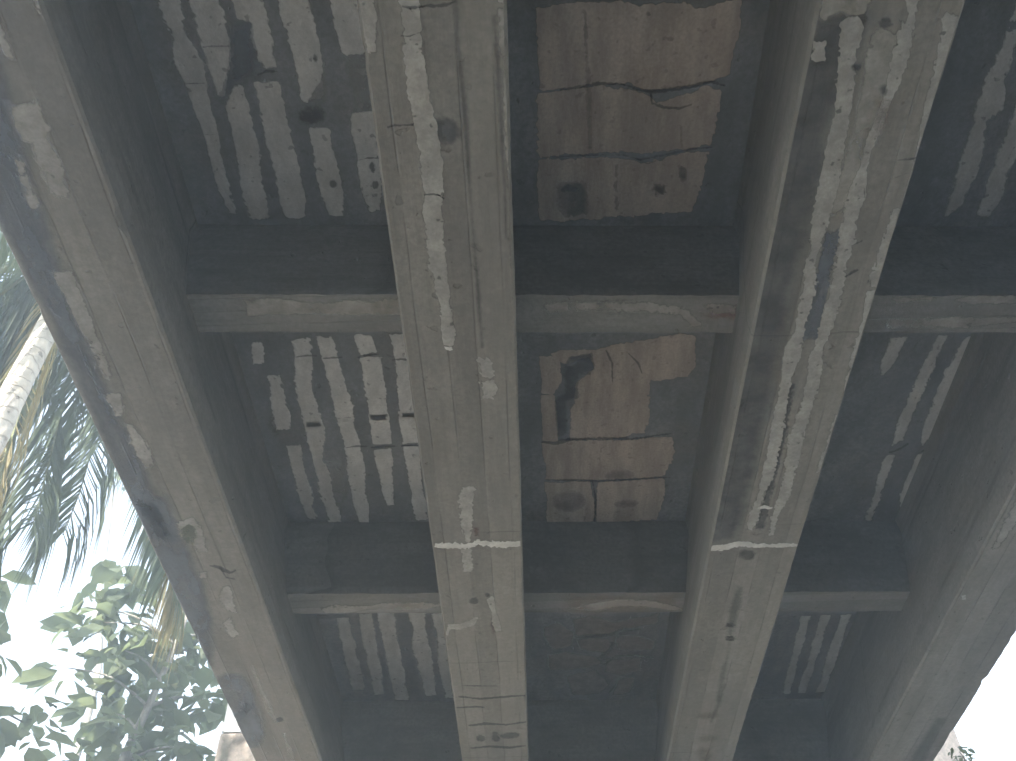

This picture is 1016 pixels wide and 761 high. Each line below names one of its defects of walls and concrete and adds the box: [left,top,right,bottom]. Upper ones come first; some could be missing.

peeling [158,0,323,220]
peeling [309,127,344,216]
peeling [398,0,456,351]
peeling [535,0,742,222]
crack [561,81,725,110]
peeling [746,0,920,536]
peeling [917,12,959,149]
peeling [944,4,1016,217]
peeling [267,334,428,522]
peeling [539,333,696,522]
peeling [865,316,1016,521]
peeling [322,602,479,701]